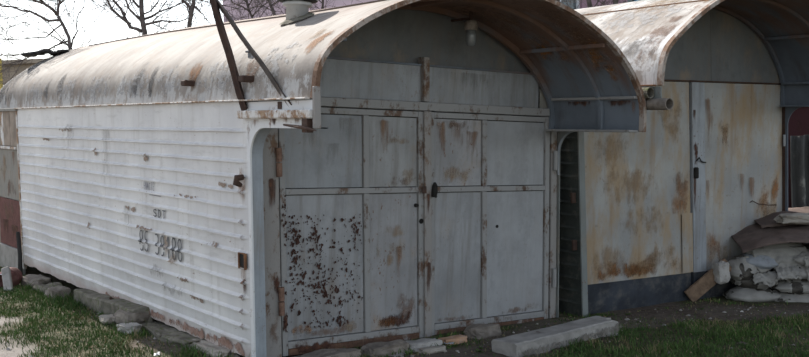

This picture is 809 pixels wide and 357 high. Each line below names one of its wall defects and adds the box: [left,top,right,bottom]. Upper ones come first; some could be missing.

leakage [0,46,90,101]
leakage [132,70,157,95]
rust [307,0,419,98]
rust [539,0,647,132]
rust [599,263,653,278]
rust [379,299,413,327]
rust [271,314,344,353]